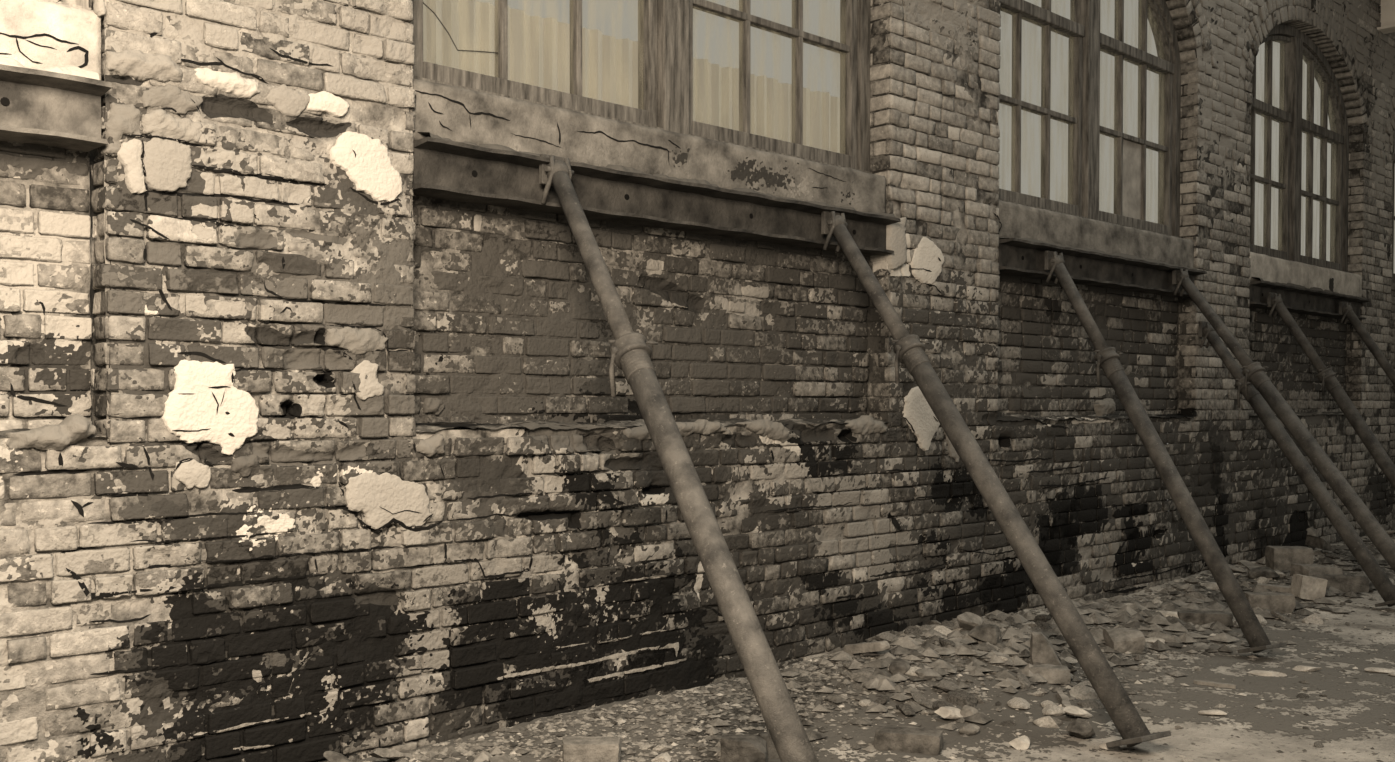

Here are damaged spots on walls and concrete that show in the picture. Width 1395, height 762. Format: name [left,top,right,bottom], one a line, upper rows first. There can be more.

crack [0,32,89,68]
spalling [101,74,143,86]
spalling [200,94,352,138]
crack [415,90,681,166]
water stain [259,386,358,448]
water stain [530,358,643,427]
water stain [1090,387,1106,398]
spalling [177,440,230,464]
water stain [1189,419,1230,557]
water stain [16,438,768,762]
water stain [669,392,1121,762]
water stain [1029,482,1395,743]